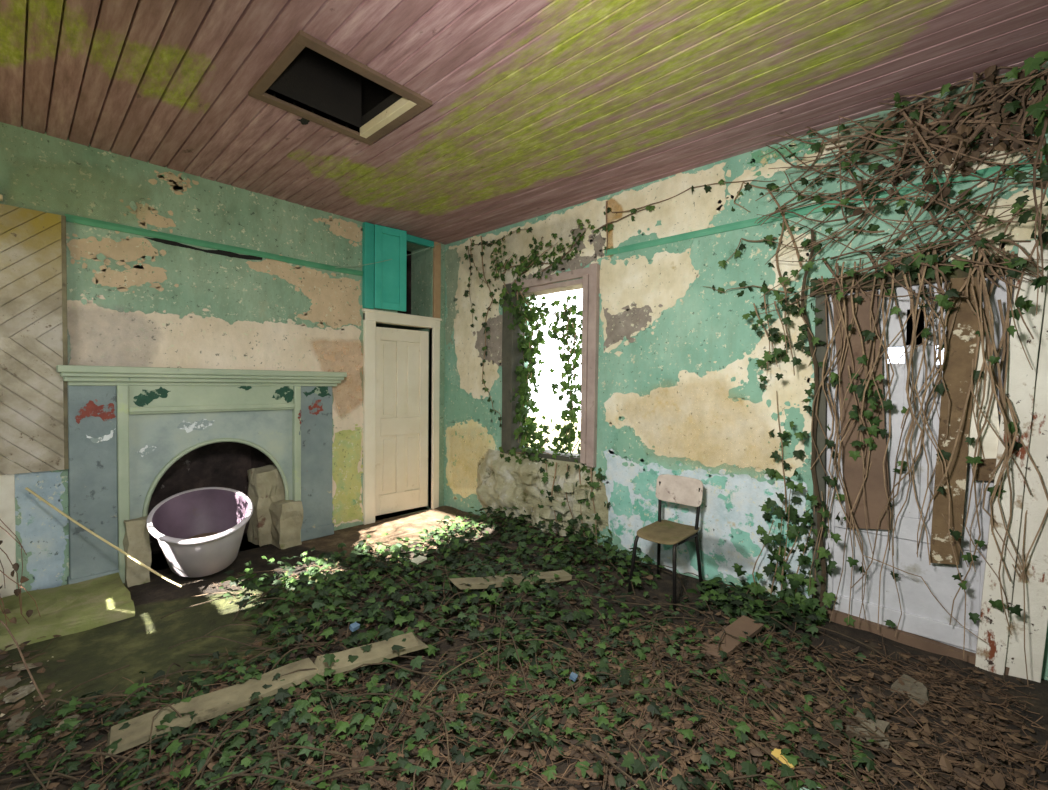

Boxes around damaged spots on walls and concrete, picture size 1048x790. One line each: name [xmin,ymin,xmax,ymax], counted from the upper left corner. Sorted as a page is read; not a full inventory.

peeling [148,170,199,195]
crack [144,237,262,260]
peeling [66,198,364,528]
peeling [445,417,496,501]
peeling [444,131,855,400]
peeling [602,227,816,599]